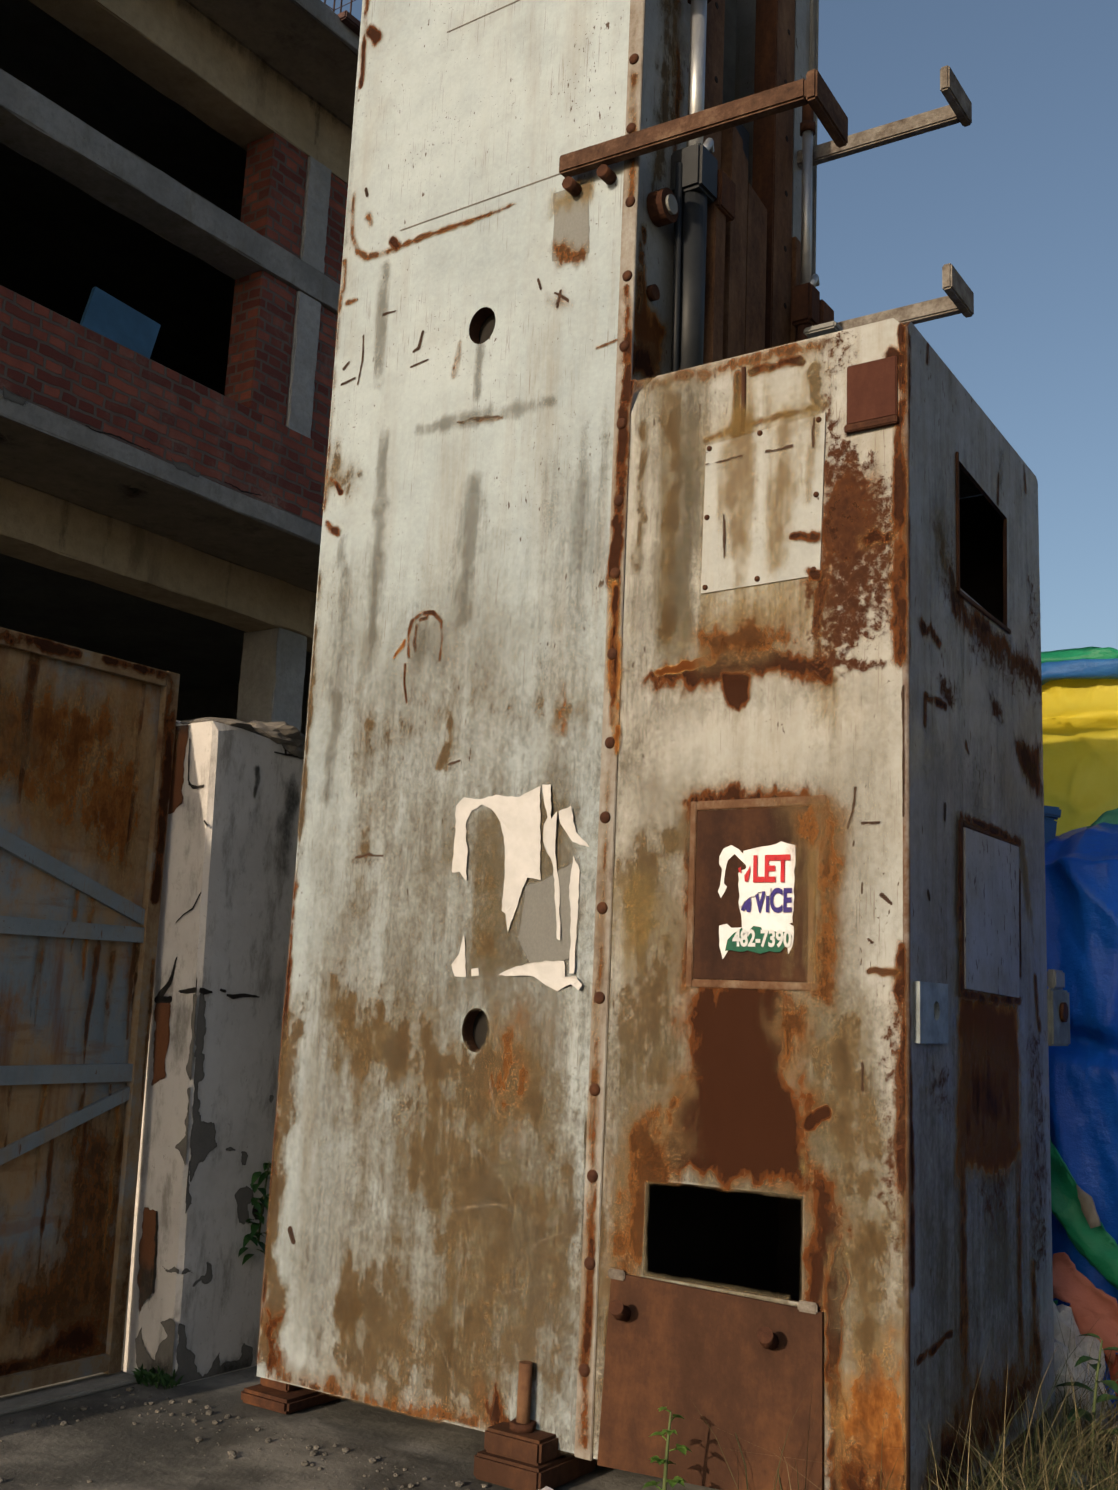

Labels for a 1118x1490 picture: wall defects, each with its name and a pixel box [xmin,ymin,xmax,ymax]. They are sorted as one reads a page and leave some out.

corrosion [358,0,382,89]
corrosion [336,188,514,349]
corrosion [605,226,941,754]
corrosion [0,630,176,905]
corrosion [354,610,460,771]
corrosion [0,889,155,1376]
flaking render [151,957,177,1086]
spalling [135,1207,253,1384]
spalling [175,993,248,1213]
spalling [235,1186,264,1225]
corrosion [257,781,915,1490]
corrosion [923,812,1042,1490]